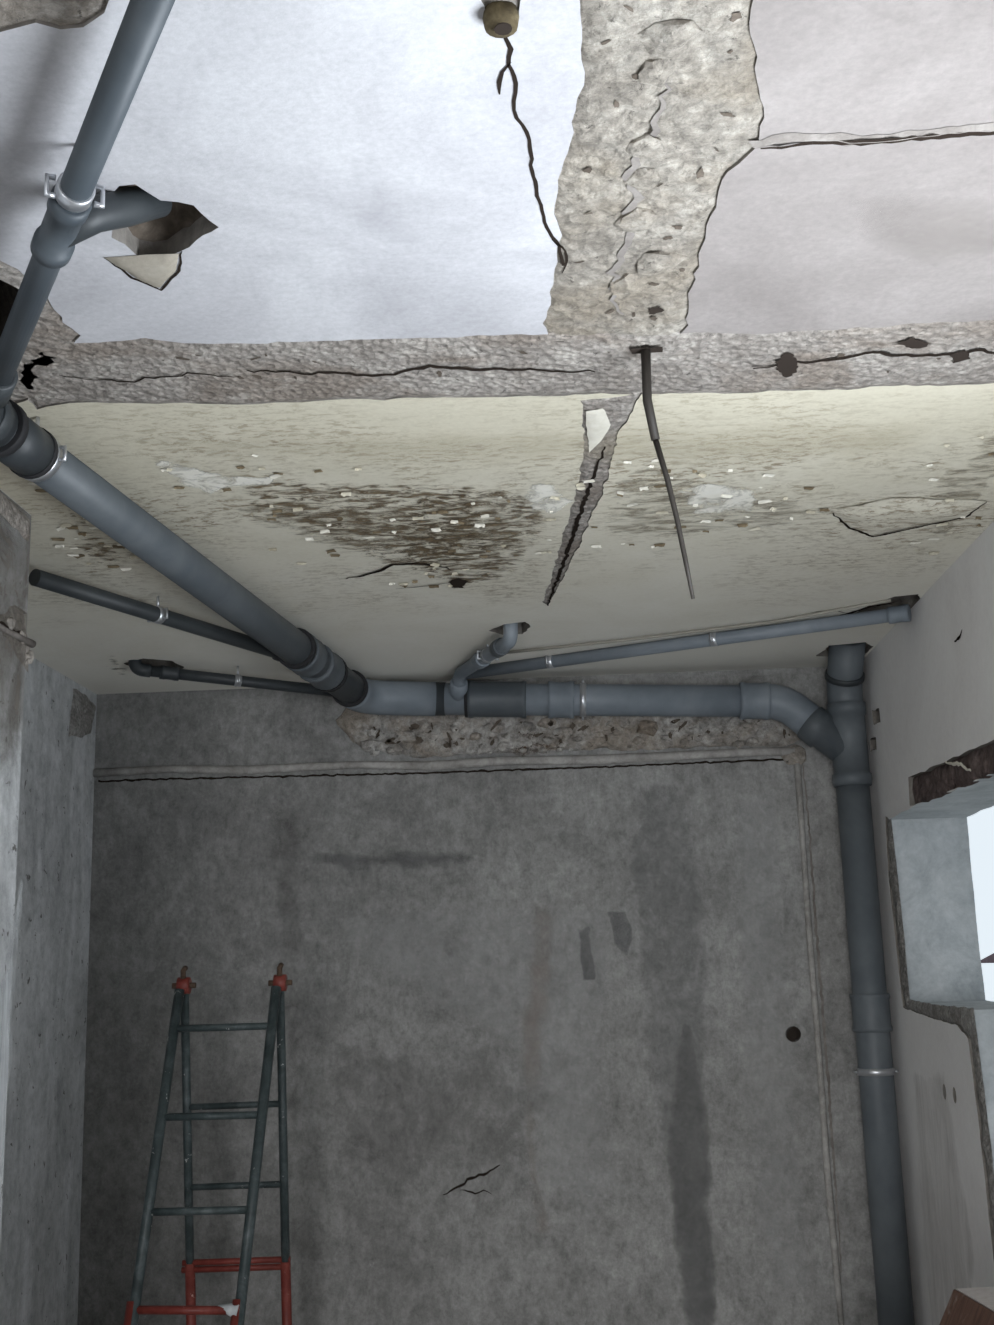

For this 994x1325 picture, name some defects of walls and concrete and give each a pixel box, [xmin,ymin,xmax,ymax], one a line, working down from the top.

spalling [0,0,994,606]
spalling [336,708,801,758]
crack [443,1165,500,1195]